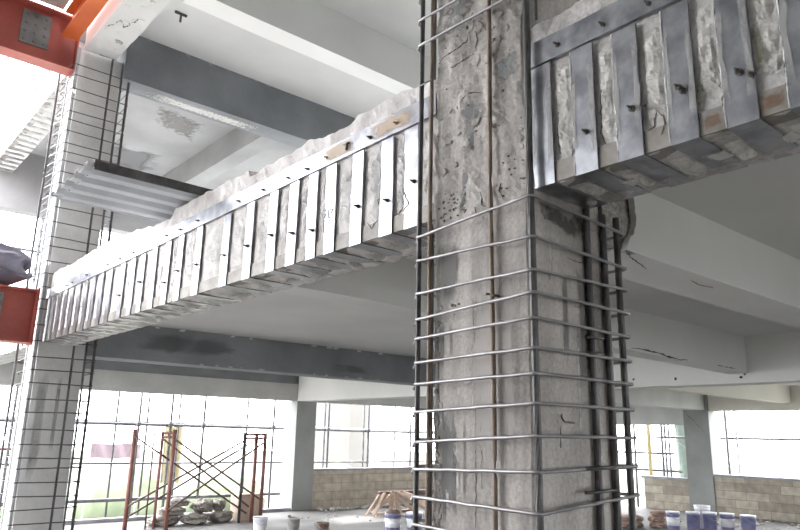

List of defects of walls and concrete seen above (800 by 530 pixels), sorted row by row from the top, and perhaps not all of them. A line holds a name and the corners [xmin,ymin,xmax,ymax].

damp [154,95,253,128]
spalling [582,206,637,530]
crack [634,348,686,360]